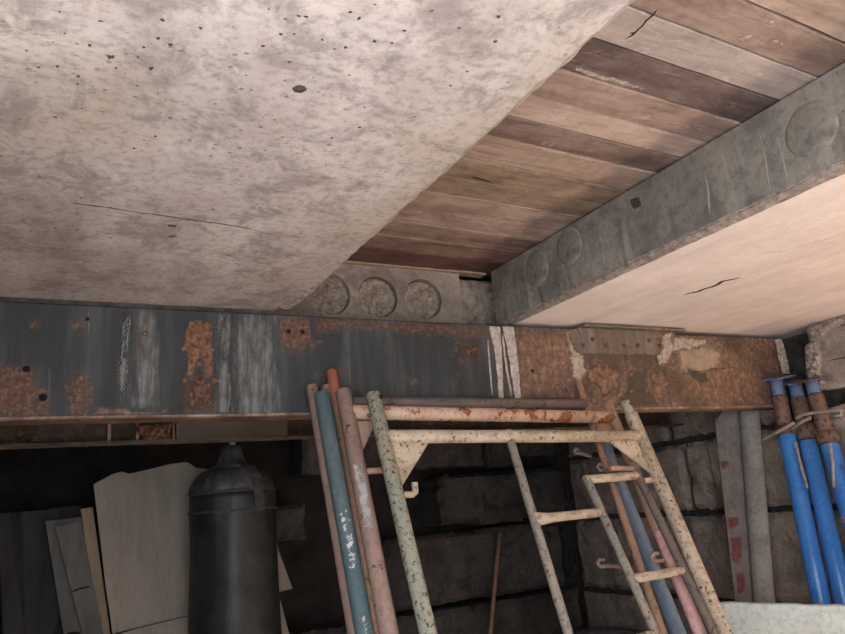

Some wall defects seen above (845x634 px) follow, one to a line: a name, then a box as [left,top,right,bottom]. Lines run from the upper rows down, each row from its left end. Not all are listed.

crack [626,10,657,39]
crack [73,203,343,240]
crack [685,277,740,295]
rust [0,359,57,417]
rust [506,327,575,399]
peeling [656,332,722,373]
rust [650,340,770,407]